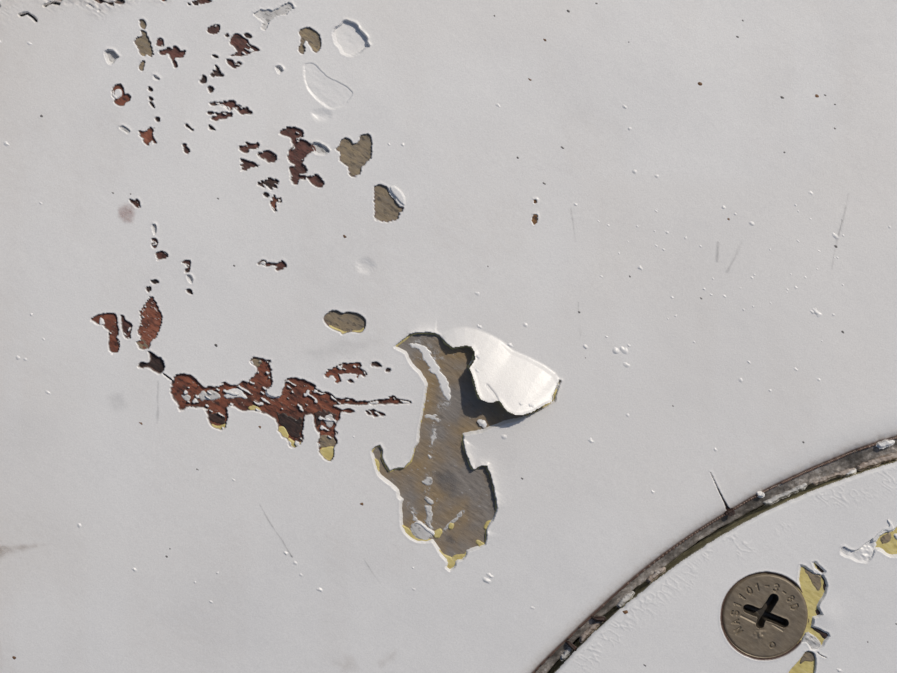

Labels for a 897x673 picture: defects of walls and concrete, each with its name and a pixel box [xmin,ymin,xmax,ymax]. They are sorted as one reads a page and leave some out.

peeling [136,20,186,70]
peeling [201,25,259,92]
peeling [299,28,321,54]
peeling [139,76,160,145]
peeling [208,100,252,130]
peeling [240,143,277,170]
peeling [281,127,372,187]
peeling [258,178,282,210]
peeling [374,185,406,222]
peeling [92,280,402,461]
peeling [372,325,561,569]
peeling [789,563,828,673]